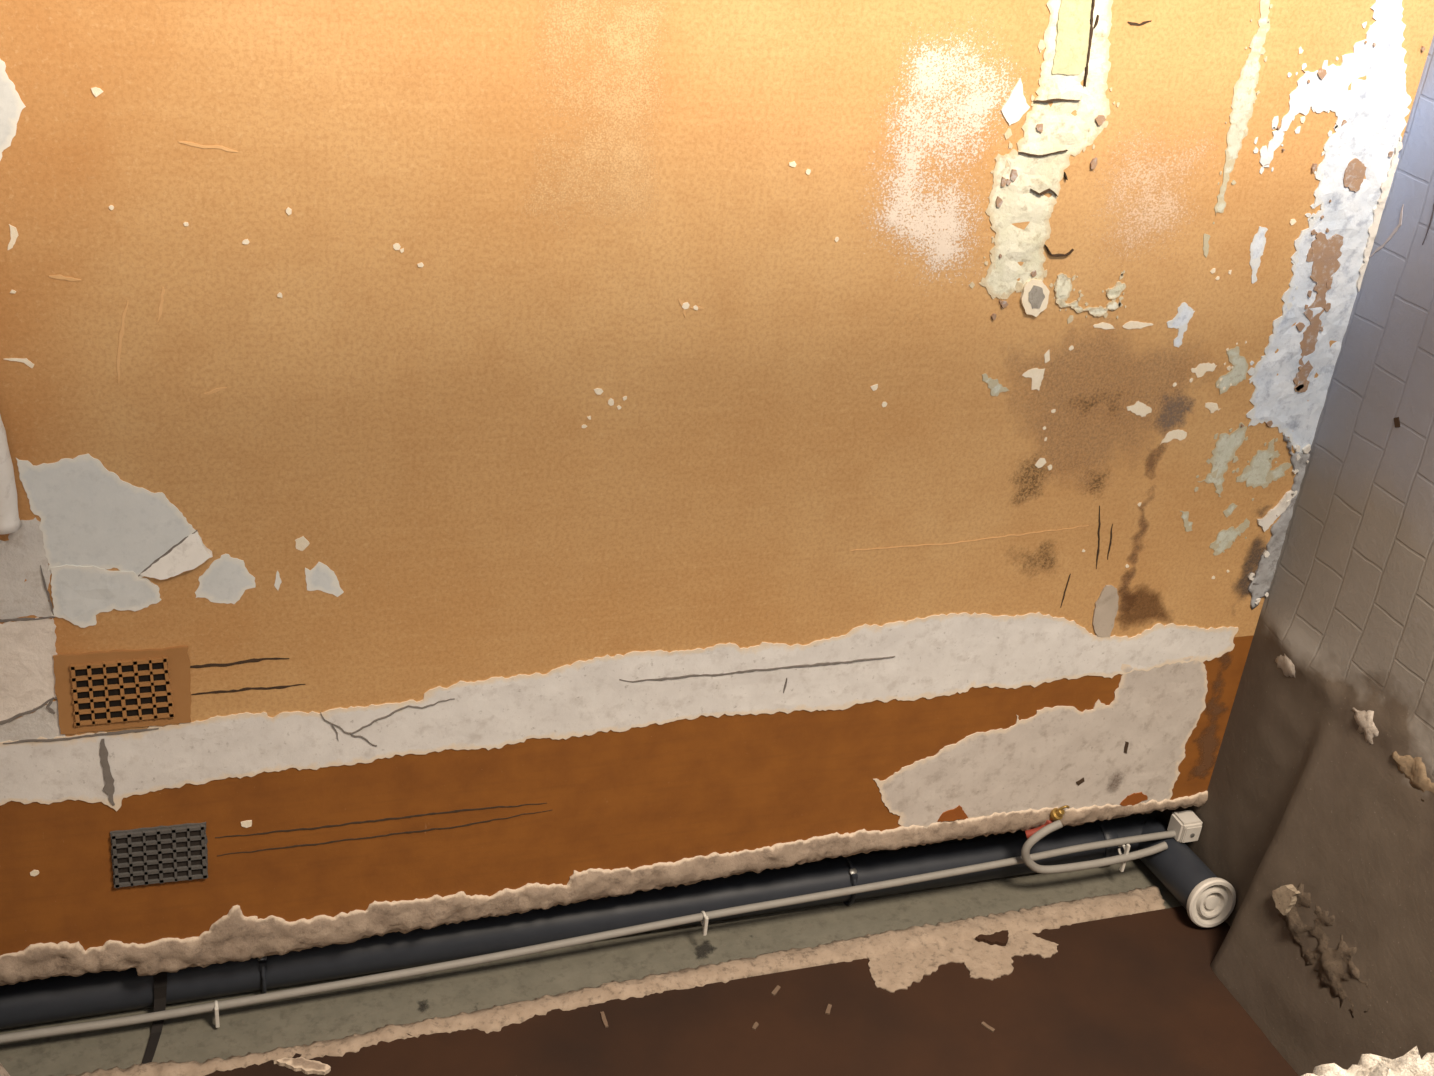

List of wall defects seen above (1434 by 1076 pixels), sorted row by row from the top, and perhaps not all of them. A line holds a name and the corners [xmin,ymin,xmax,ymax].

peeling [0,59,26,161]
efflorescence [848,14,1026,295]
peeling [969,0,1195,348]
peeling [1022,350,1050,391]
peeling [1126,401,1152,417]
peeling [1173,0,1425,609]
damp [1121,510,1166,624]
crack [0,697,159,805]
crack [190,658,455,746]
peeling [0,453,1238,986]
spalling [50,885,1166,1076]
spalling [1272,883,1371,1018]